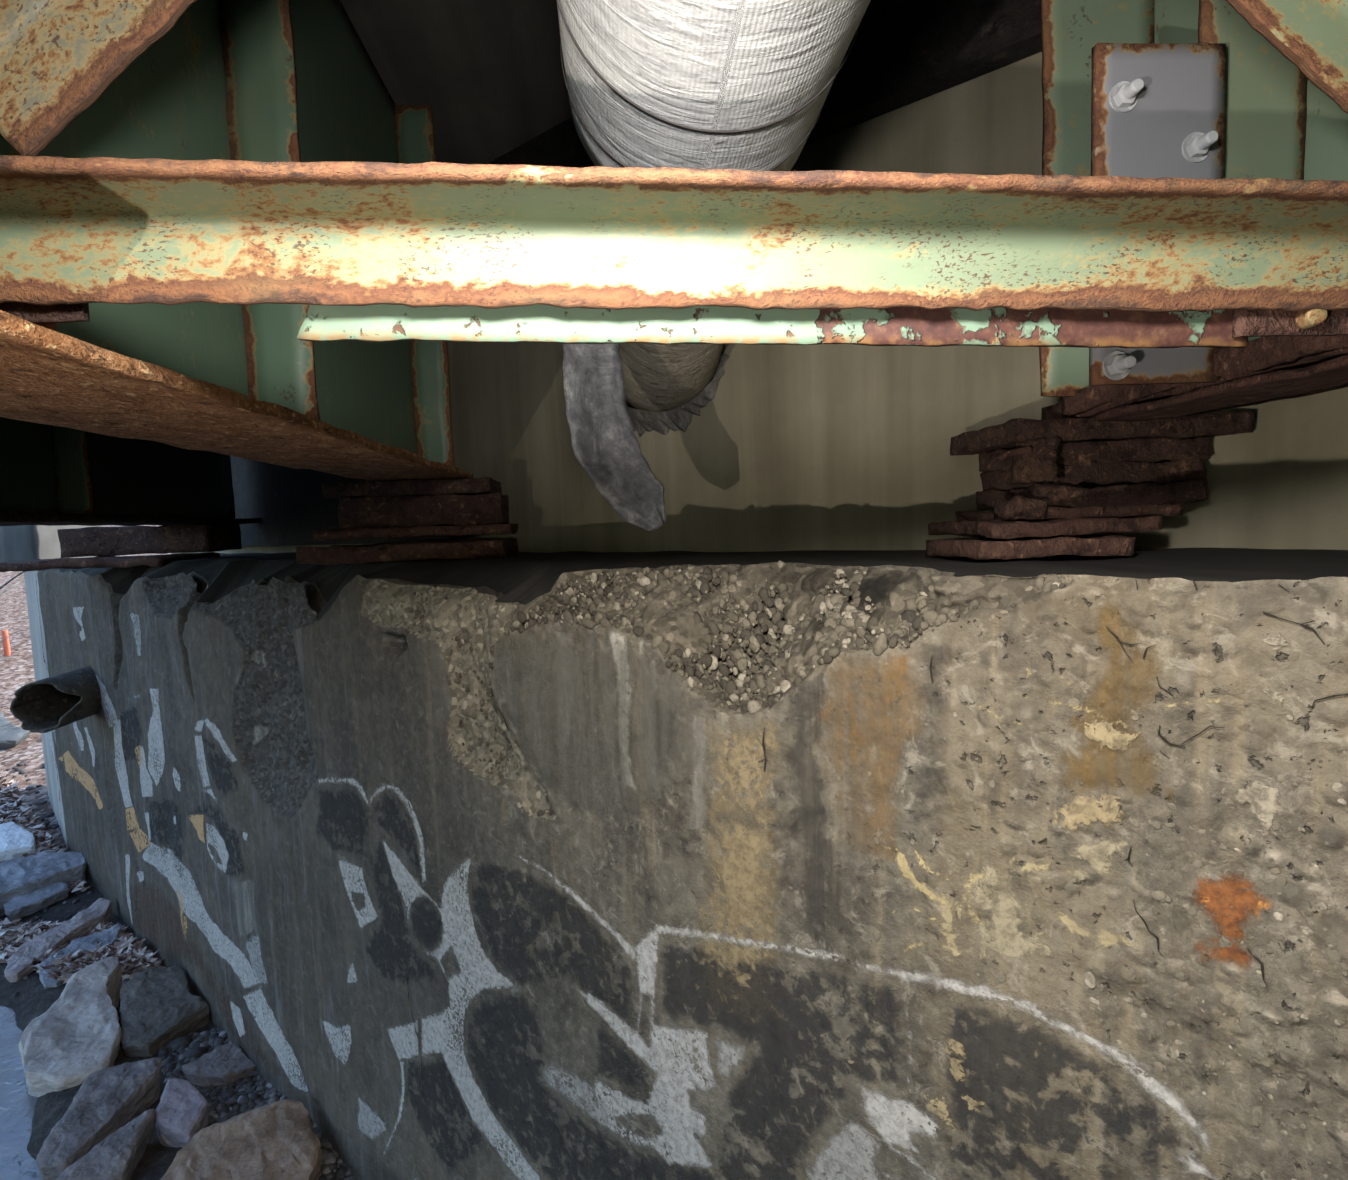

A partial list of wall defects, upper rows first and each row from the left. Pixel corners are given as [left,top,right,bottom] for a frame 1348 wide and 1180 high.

spalling [361,560,1074,820]
crack [1310,693,1348,710]
corrosion [1196,877,1269,964]